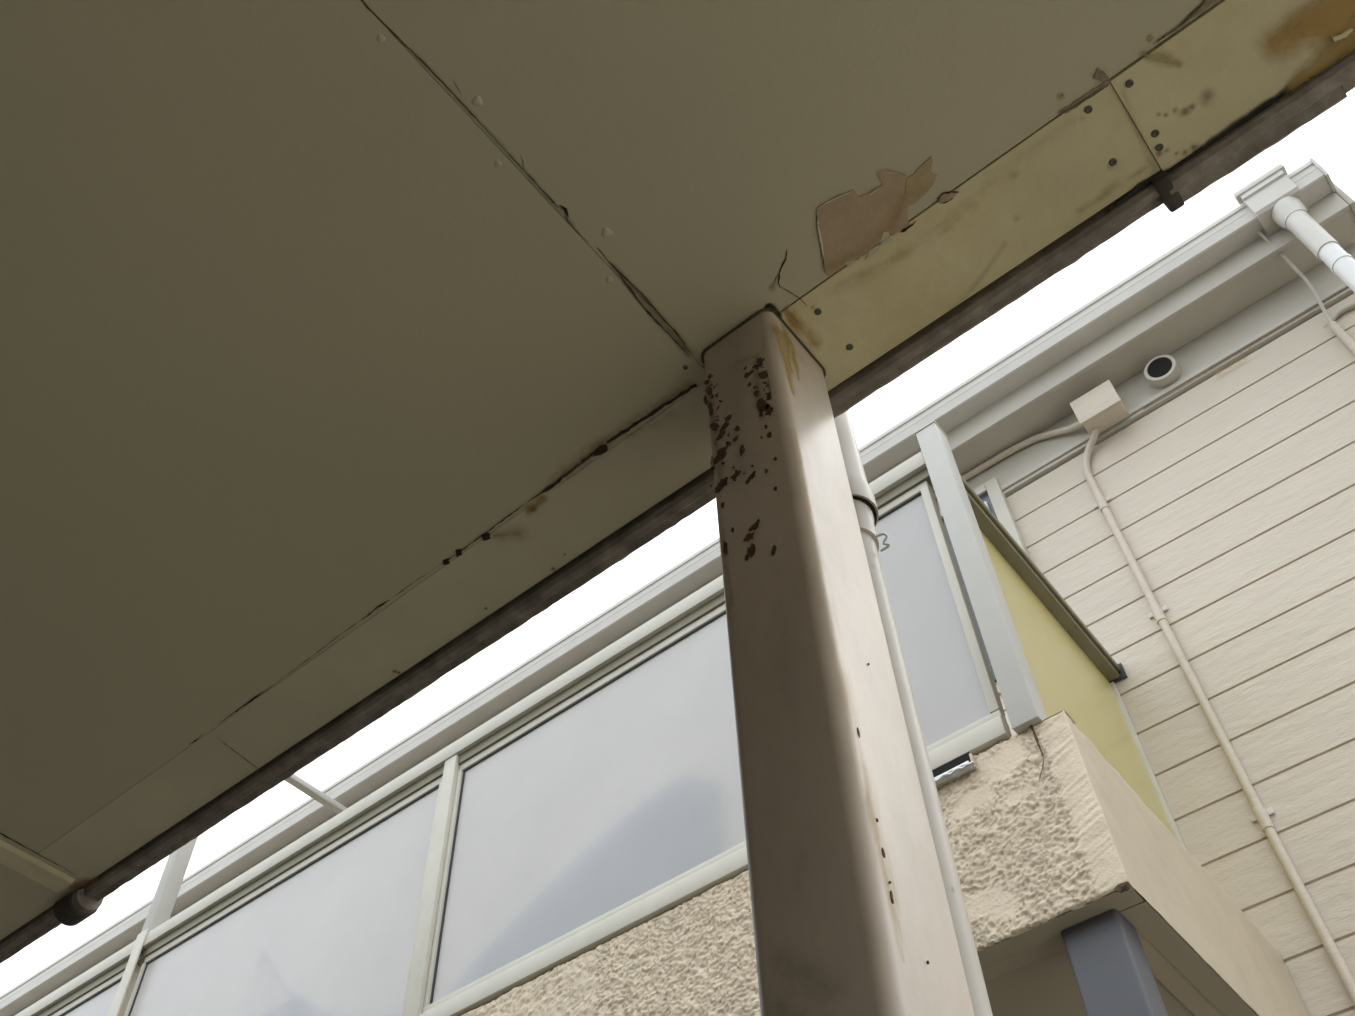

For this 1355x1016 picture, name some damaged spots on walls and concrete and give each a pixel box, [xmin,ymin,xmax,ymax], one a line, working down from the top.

peeling [811,156,959,276]